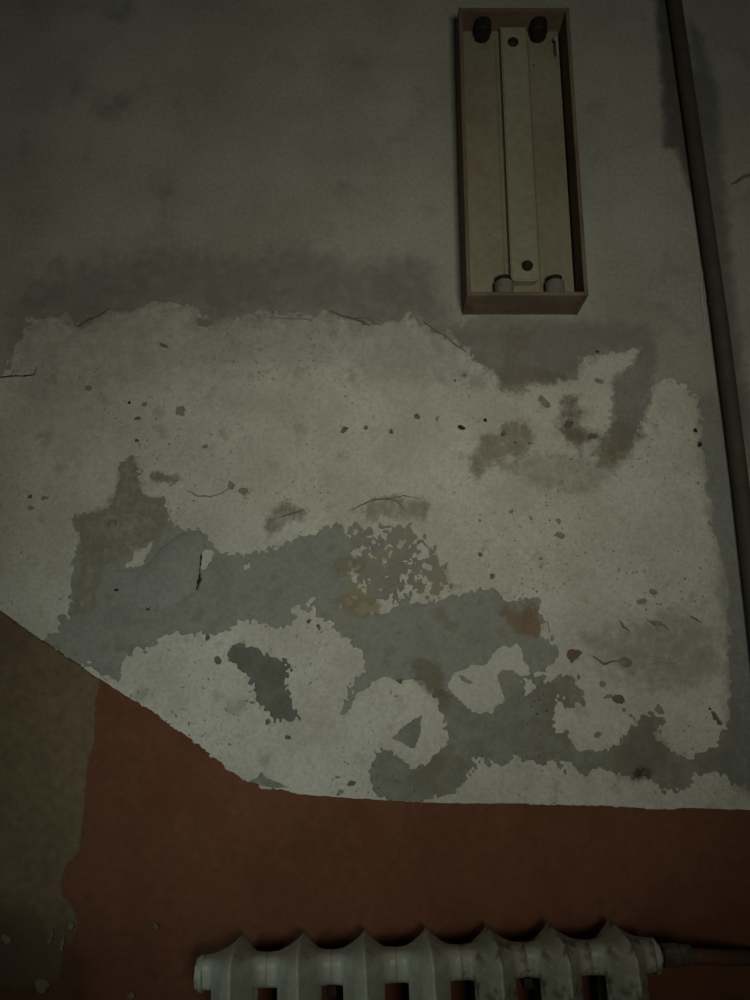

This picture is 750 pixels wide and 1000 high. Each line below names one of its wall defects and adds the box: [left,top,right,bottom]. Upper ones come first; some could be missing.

water stain [560,352,656,464]
peeling [0,301,750,810]
crack [352,495,420,510]